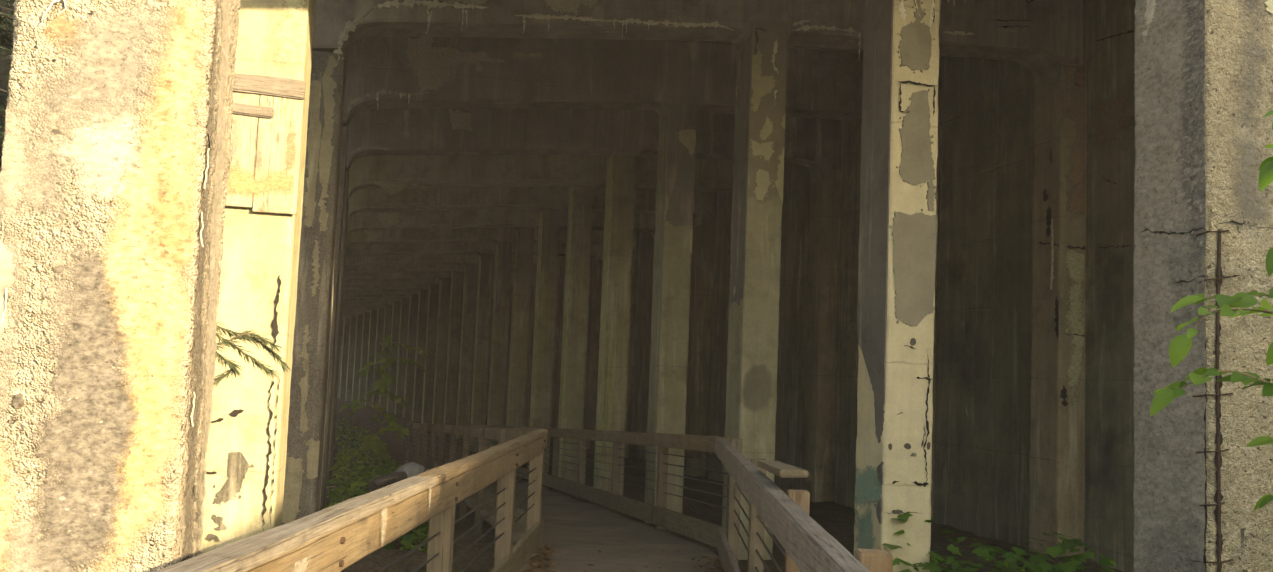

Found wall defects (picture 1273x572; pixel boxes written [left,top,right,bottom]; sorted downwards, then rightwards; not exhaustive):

rust [100,1,206,572]
crack [211,275,281,531]
peeling [729,19,788,310]
peeling [857,0,938,524]